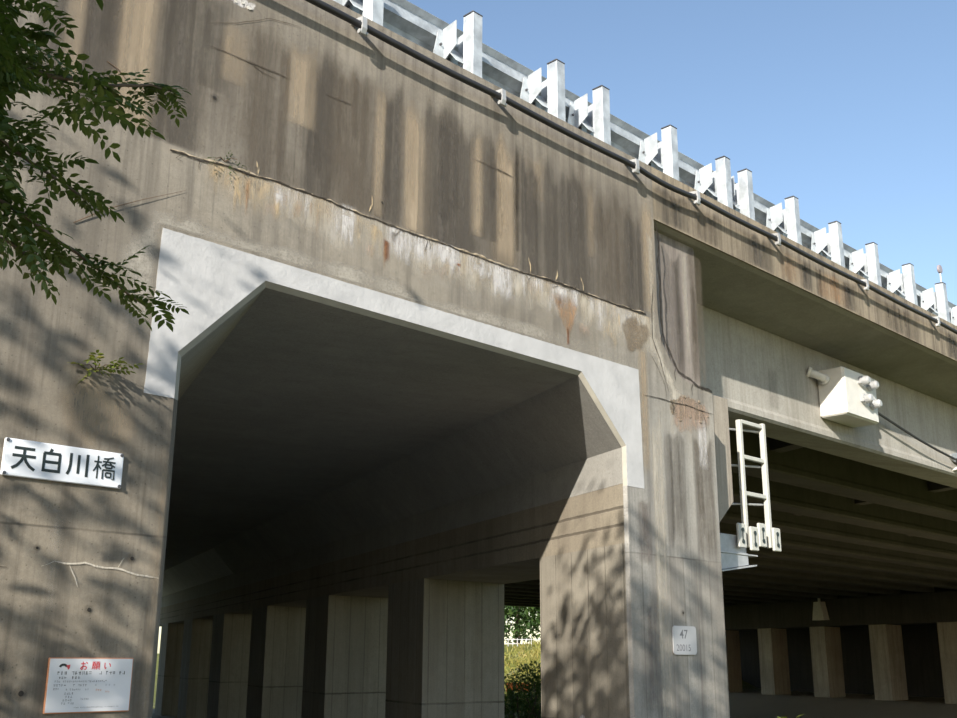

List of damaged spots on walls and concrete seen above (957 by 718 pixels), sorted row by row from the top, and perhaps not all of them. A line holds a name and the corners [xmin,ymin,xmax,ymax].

leakage [213,164,281,213]
crack [170,149,712,429]
leakage [803,264,822,295]
leakage [293,60,703,674]
spalling [670,395,709,430]
crack [42,557,159,587]